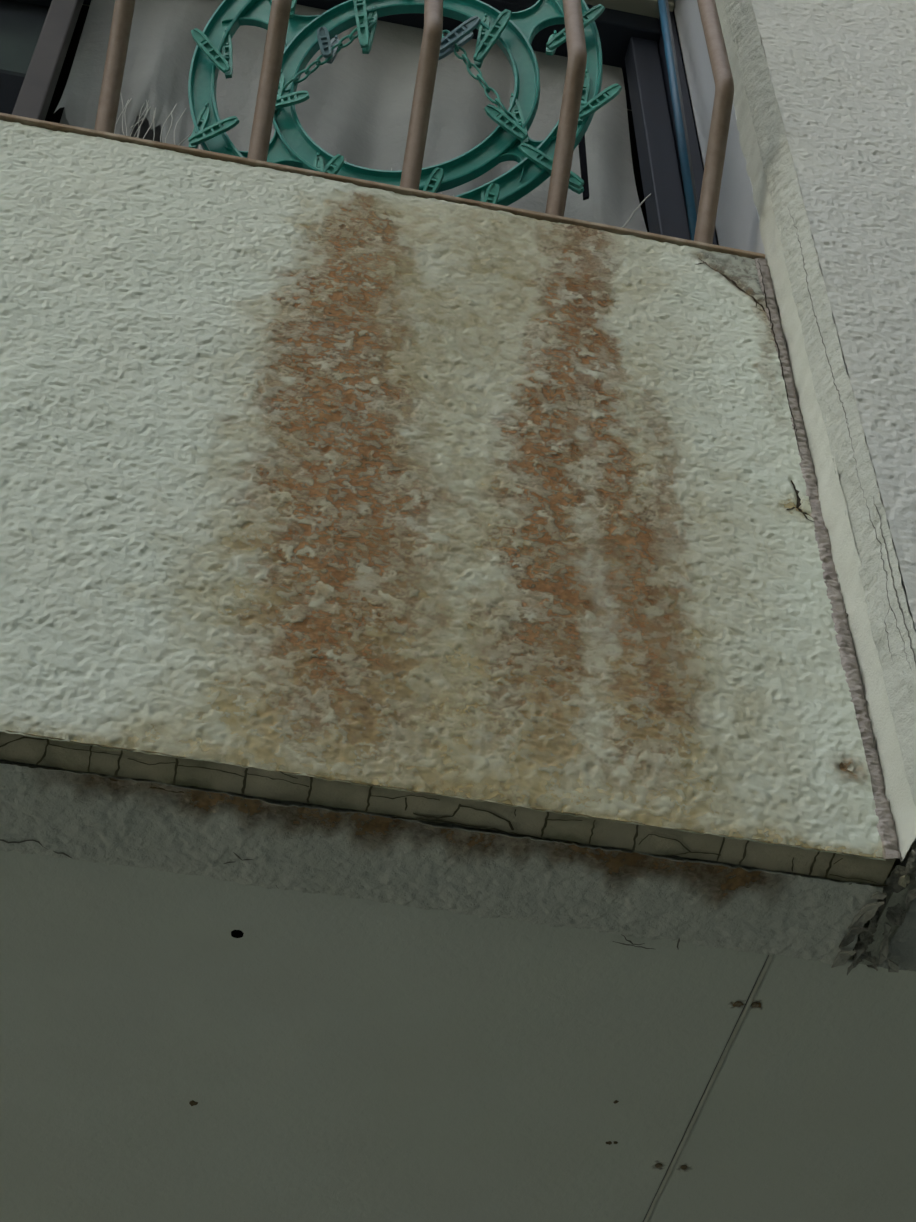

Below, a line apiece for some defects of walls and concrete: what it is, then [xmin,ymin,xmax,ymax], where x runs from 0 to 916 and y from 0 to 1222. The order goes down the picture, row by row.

rust [199,196,429,781]
rust [446,227,712,819]
crack [695,257,901,853]
crack [788,209,916,671]
crack [0,736,313,807]
rust [280,806,407,840]
crack [365,786,749,865]
crack [791,851,888,887]
spalling [831,849,916,975]